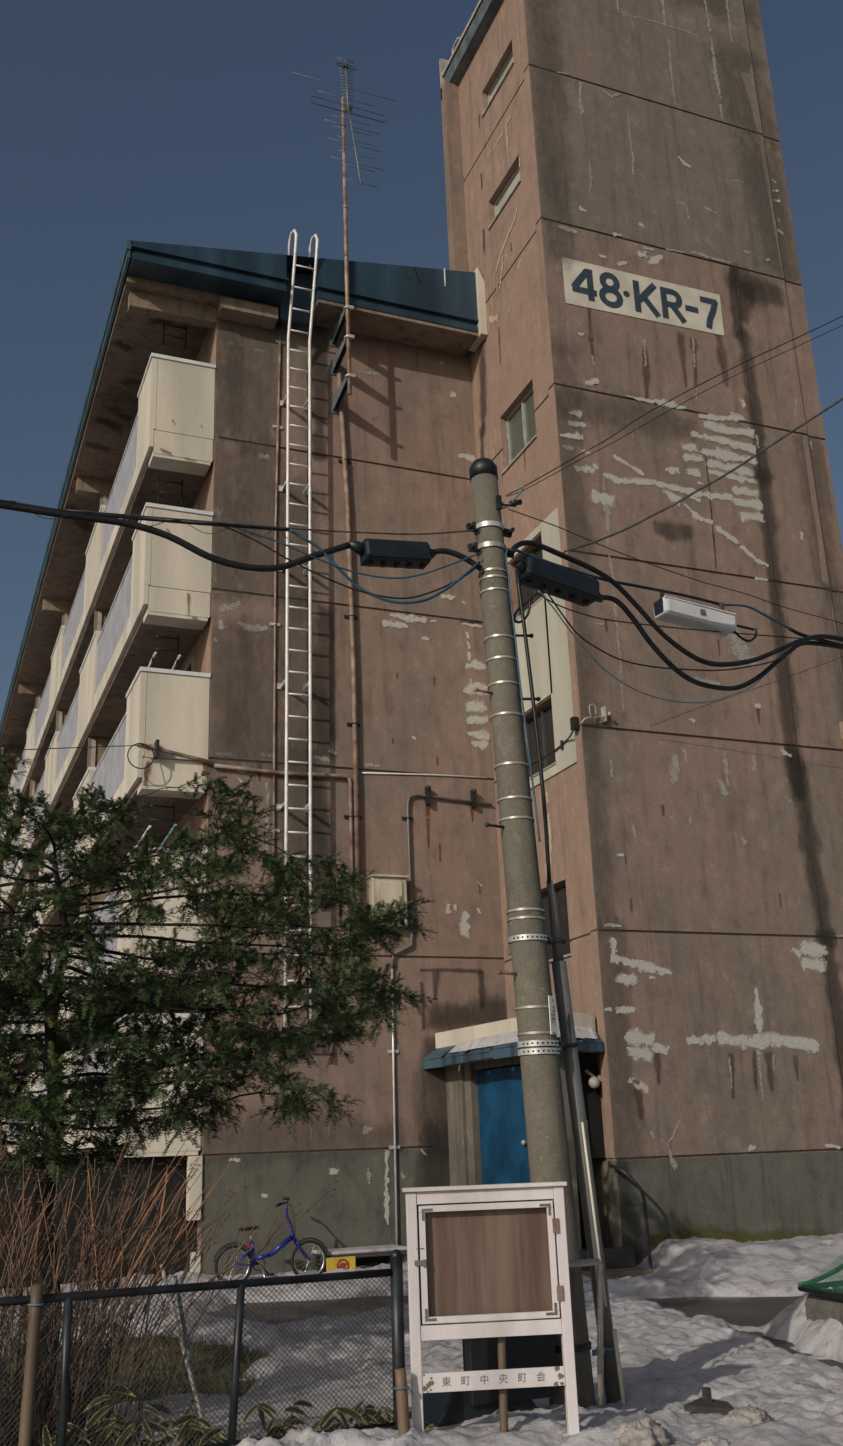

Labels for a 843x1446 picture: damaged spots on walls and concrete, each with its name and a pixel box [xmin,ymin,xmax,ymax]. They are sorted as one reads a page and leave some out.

peeling [626,395,686,409]
spalling [382,613,436,641]
peeling [462,622,490,750]
leakage [666,248,843,1071]